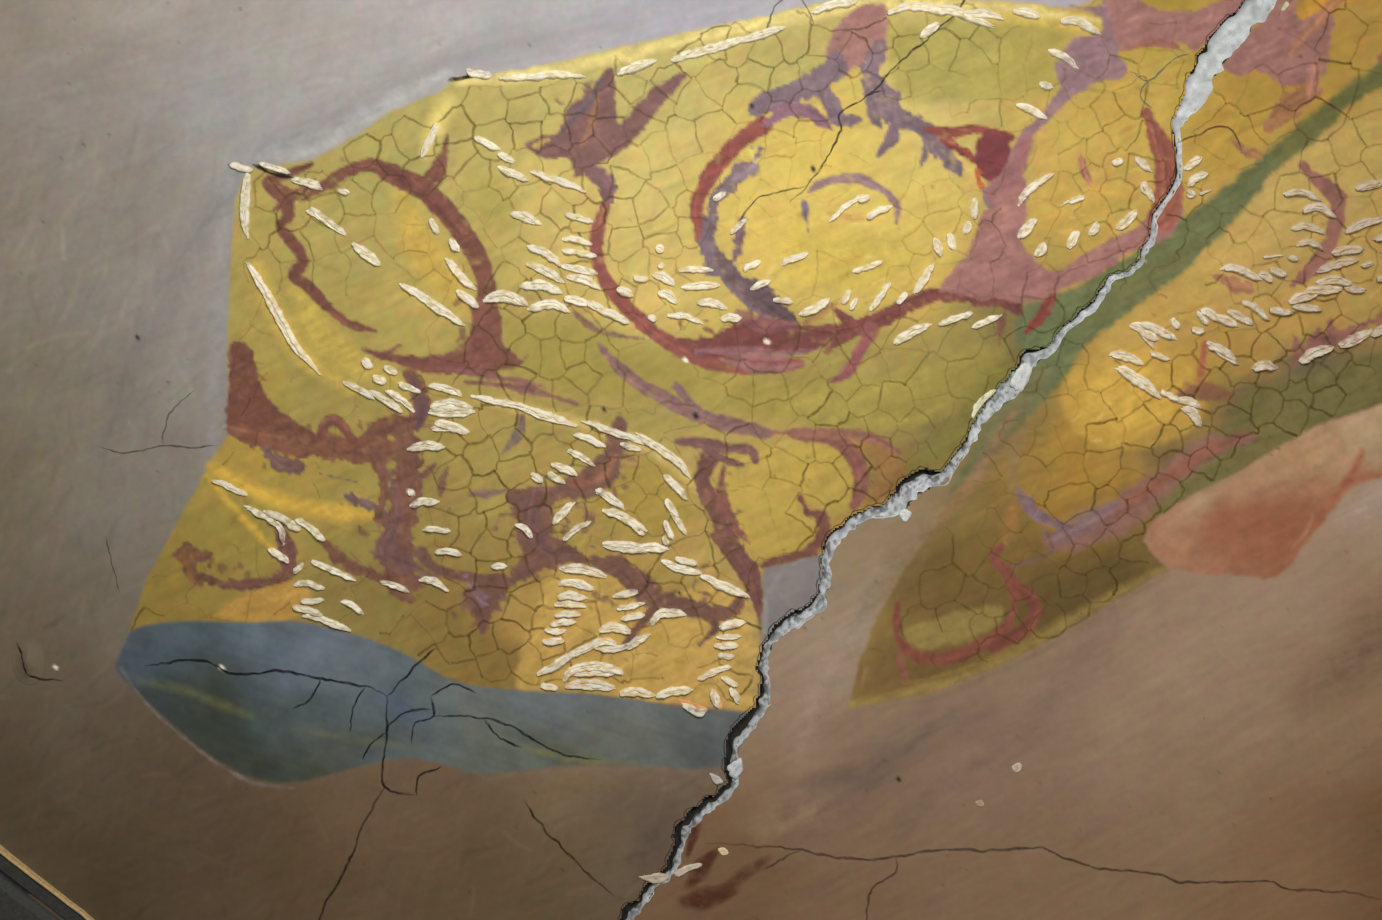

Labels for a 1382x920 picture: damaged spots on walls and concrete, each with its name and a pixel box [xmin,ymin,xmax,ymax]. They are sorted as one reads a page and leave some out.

peeling [972,389,996,418]
crack [618,0,1323,920]
crack [168,650,588,794]
crack [319,818,367,919]
crack [530,809,596,881]